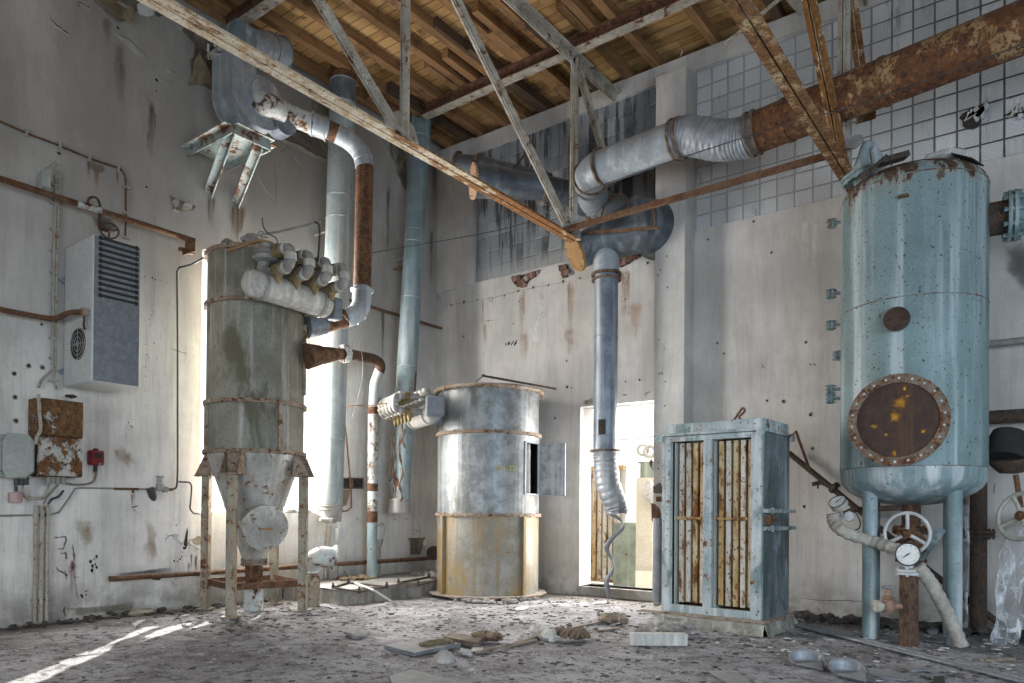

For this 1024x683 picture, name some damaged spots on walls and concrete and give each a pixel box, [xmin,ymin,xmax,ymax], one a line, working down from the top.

spalling [450,264,581,306]